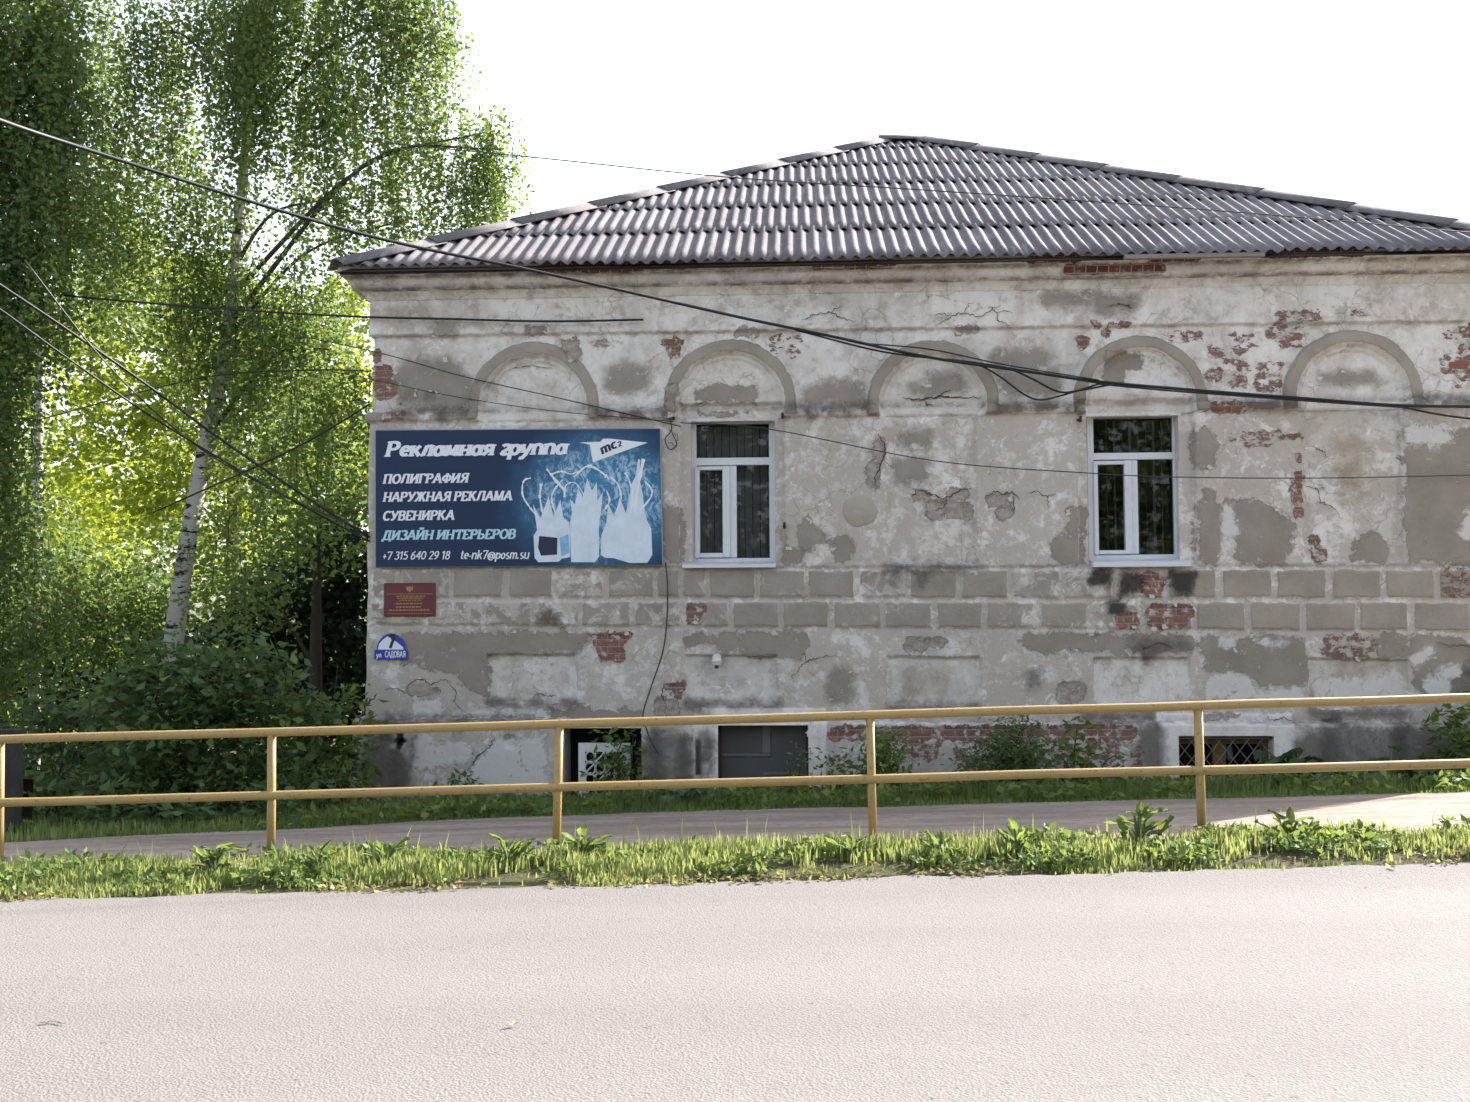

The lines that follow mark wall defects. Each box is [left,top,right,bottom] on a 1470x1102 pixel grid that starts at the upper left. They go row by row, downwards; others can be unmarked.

peeling [372,348,471,422]
flaking render [525,325,611,362]
flaking render [660,335,685,358]
peeling [661,382,759,418]
flaking render [864,428,1014,522]
peeling [1049,505,1089,566]
peeling [1169,309,1327,568]
peeling [1396,425,1470,598]
flaking render [1439,323,1470,388]
peeling [400,627,633,718]
peeling [1019,570,1470,695]
flaking render [827,679,1143,780]